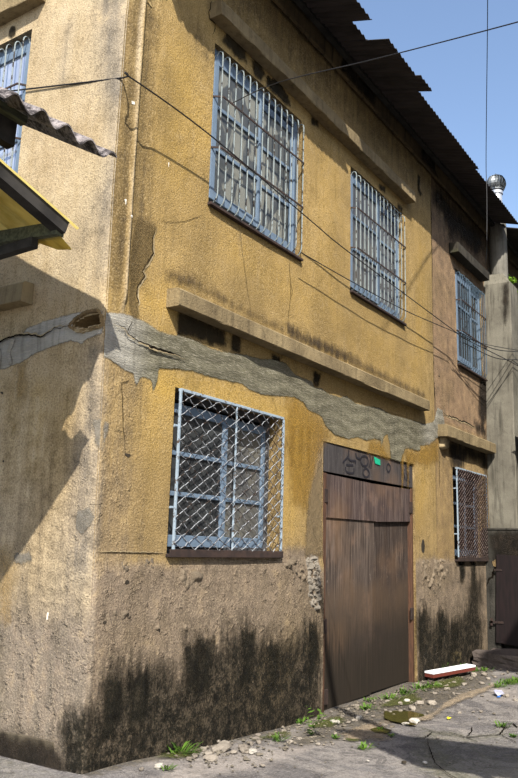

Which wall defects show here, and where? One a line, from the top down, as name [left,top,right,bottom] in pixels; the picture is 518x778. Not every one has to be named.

crack [0,325,66,343]
spalling [68,308,104,334]
crack [115,215,202,359]
peeling [284,460,323,611]
water stain [416,561,483,682]
water stain [0,621,321,774]